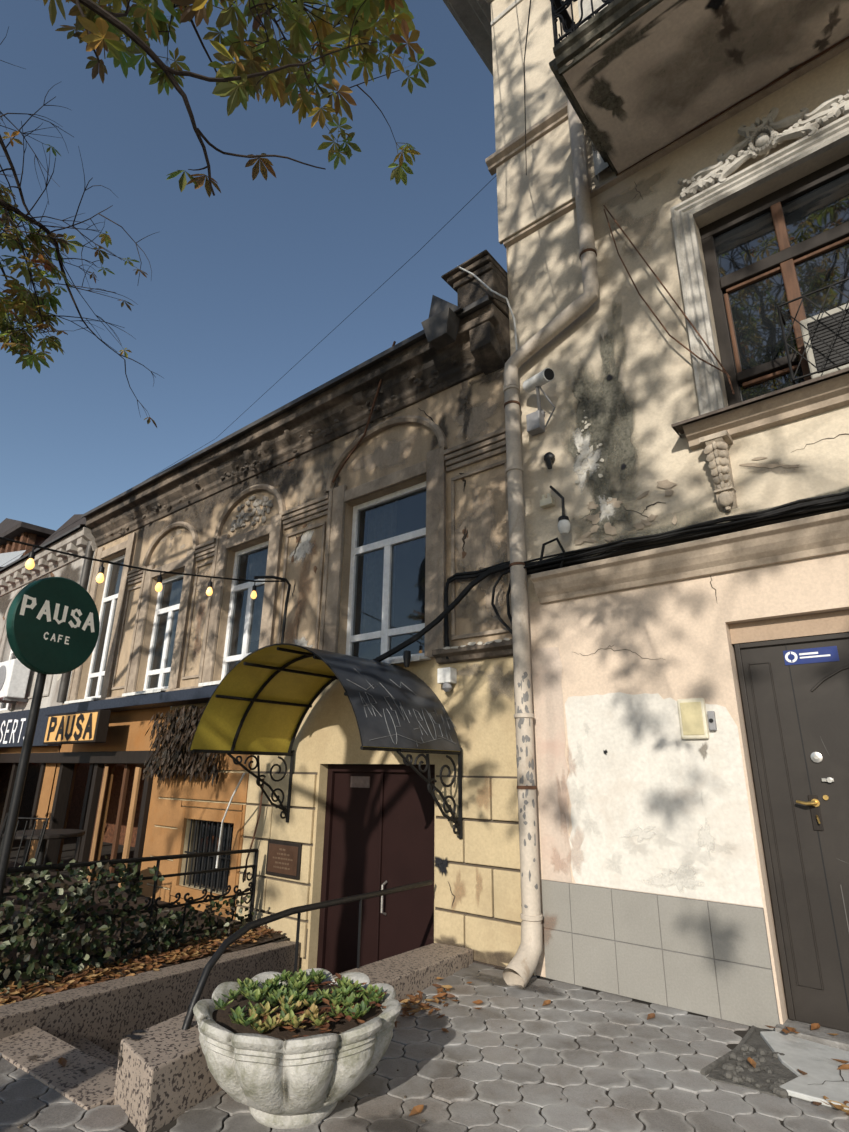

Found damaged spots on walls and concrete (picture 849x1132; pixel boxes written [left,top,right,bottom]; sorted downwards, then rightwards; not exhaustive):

damp [706,0,737,38]
damp [580,21,655,155]
peeling [575,410,604,484]
flaking render [739,457,800,468]
flaking render [637,479,677,499]
flaking render [575,497,623,545]
crack [578,645,665,660]